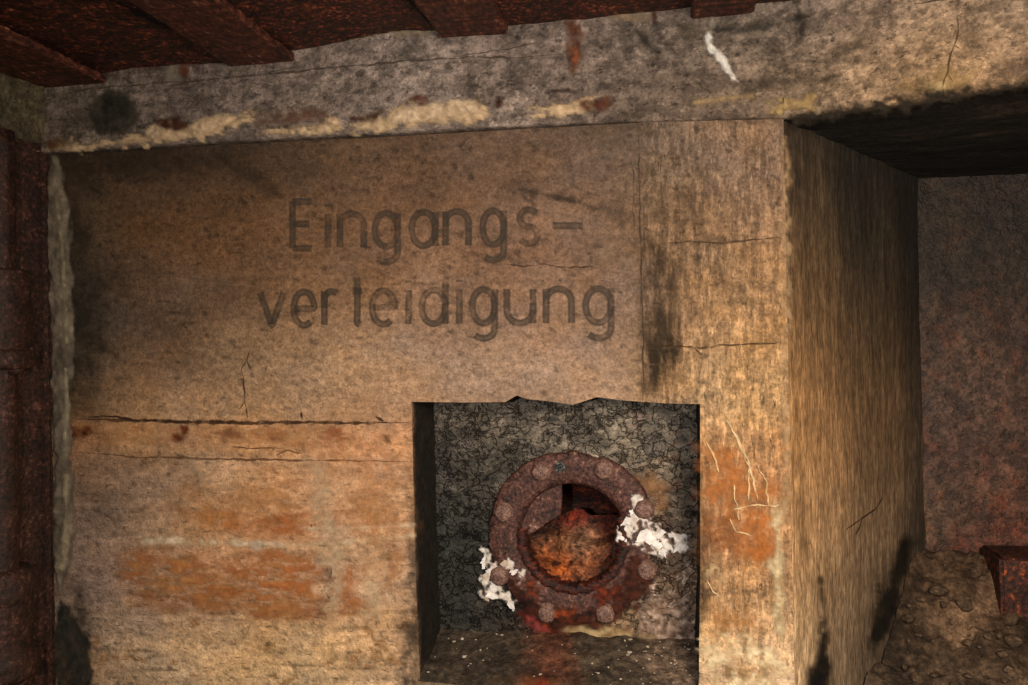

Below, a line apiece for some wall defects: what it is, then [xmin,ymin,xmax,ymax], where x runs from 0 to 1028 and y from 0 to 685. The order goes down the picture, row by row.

leakage [91,91,137,133]
spalling [47,109,256,151]
spalling [263,95,501,136]
spalling [529,89,610,118]
leakage [647,307,677,383]
corrosion [706,449,776,561]
corrosion [507,556,654,637]
leakage [563,594,793,685]